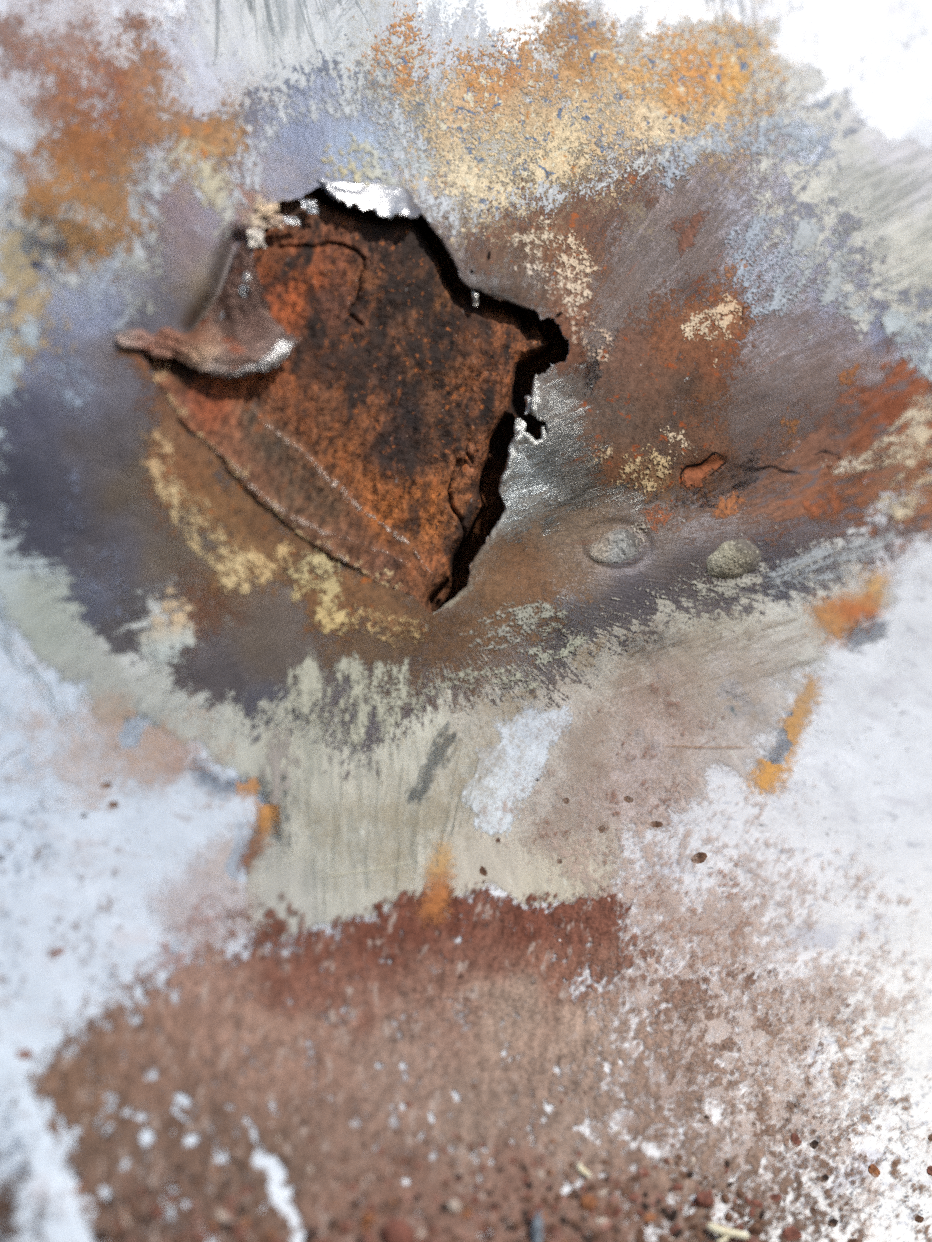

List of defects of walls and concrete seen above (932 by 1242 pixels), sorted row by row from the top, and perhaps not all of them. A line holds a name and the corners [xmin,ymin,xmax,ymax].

rust [0,0,260,389]
peeling [0,0,932,939]
rust [111,0,932,713]
rust [747,674,823,794]